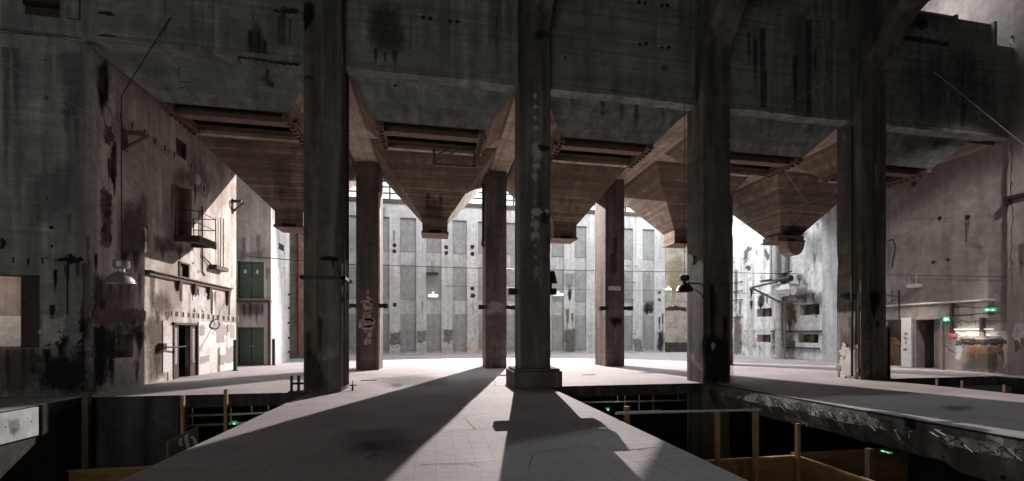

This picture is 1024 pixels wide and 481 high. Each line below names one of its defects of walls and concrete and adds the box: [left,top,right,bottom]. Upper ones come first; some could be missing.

water stain [96,61,114,132]
water stain [2,229,170,392]
flaking render [836,322,874,379]
corrosion [969,338,1023,360]